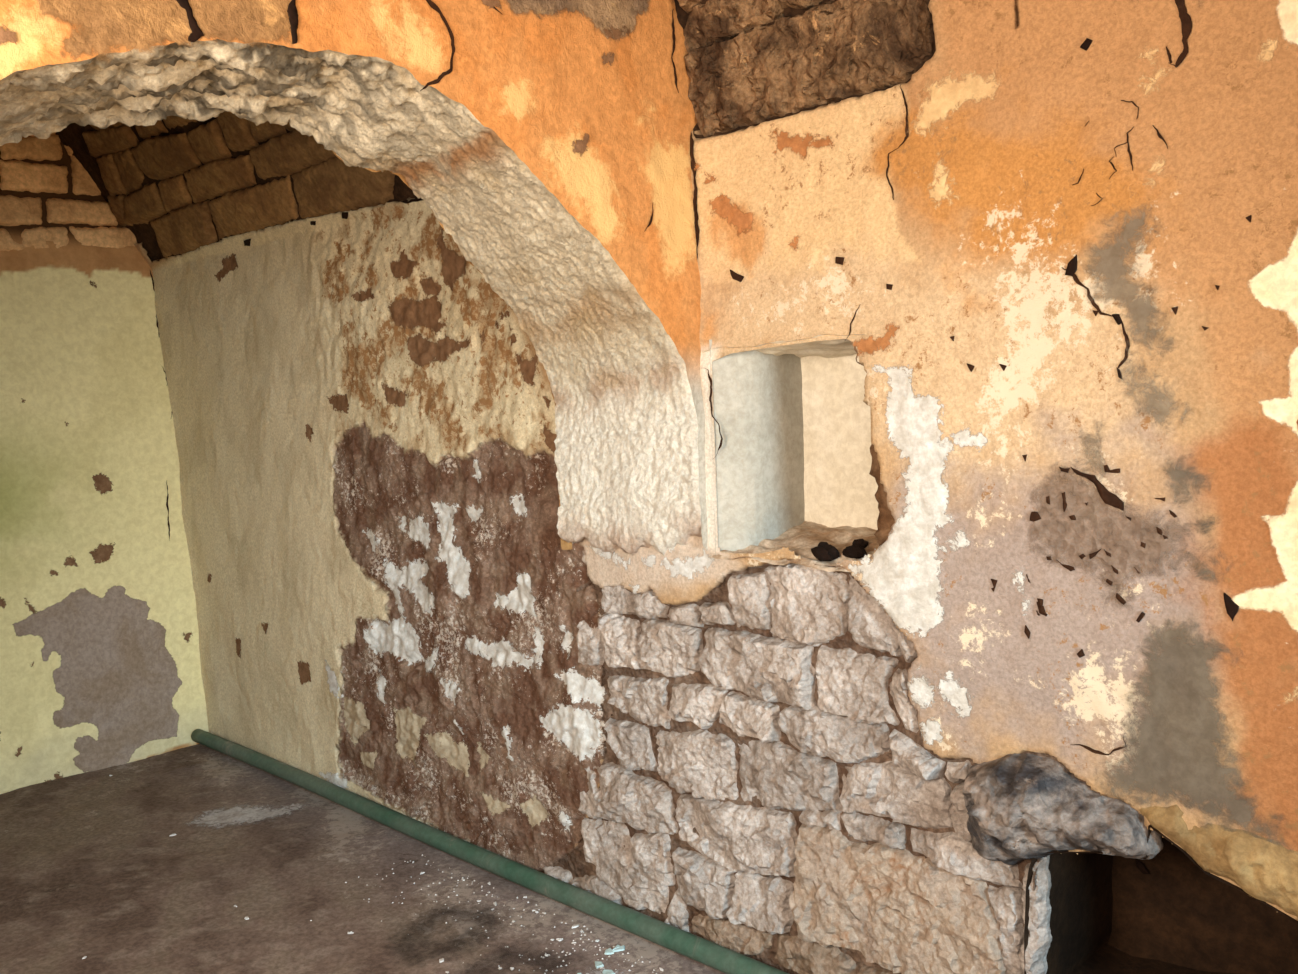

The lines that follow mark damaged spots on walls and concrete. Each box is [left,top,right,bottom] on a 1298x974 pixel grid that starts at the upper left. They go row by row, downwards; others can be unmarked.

spalling [38,0,293,60]
crack [287,0,299,44]
crack [420,0,455,91]
crack [671,9,679,93]
spalling [674,0,1000,158]
crack [1166,0,1192,68]
peeling [388,228,551,408]
crack [1062,267,1130,368]
peeling [1249,231,1298,329]
peeling [1233,481,1298,632]
peeling [12,586,182,782]
spalling [297,324,1052,974]